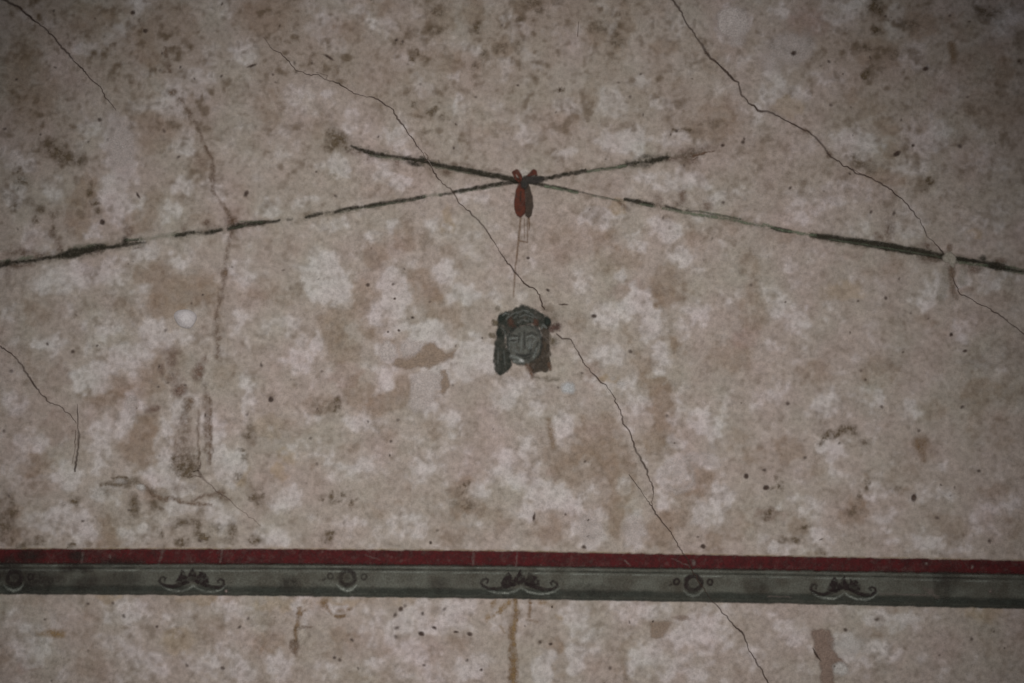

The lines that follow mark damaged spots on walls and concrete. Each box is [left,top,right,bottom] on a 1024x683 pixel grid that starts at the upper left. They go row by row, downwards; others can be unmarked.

crack [4,0,109,101]
crack [265,39,545,309]
crack [673,0,1024,334]
crack [0,346,79,472]
crack [557,334,768,683]